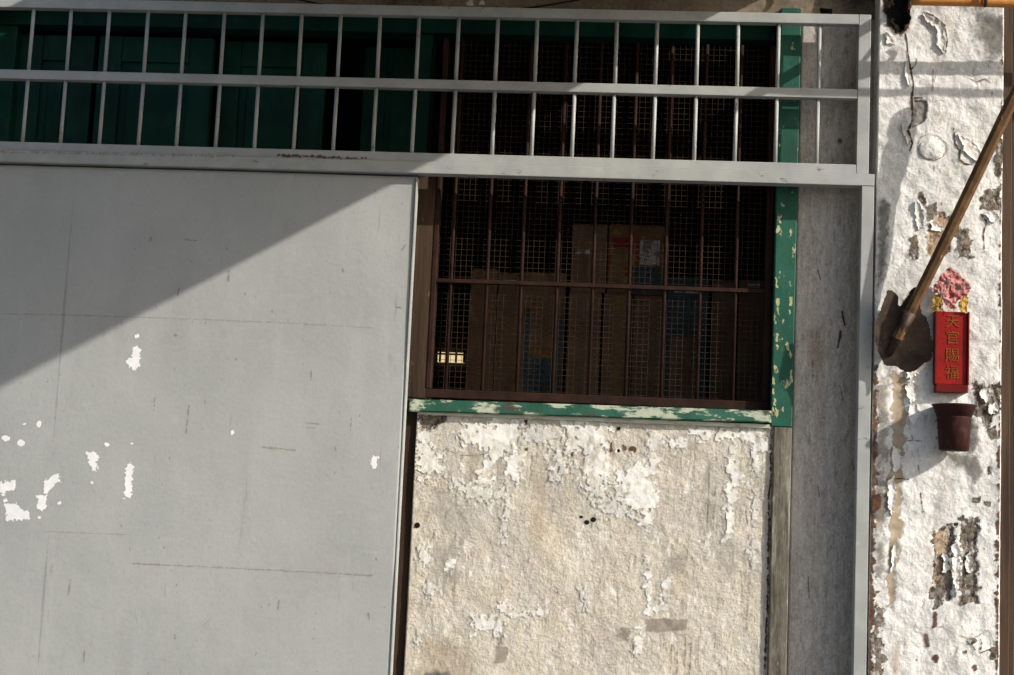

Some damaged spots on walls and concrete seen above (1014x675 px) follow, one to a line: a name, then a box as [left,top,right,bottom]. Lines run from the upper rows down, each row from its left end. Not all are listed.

spalling [885,0,911,44]
peeling [923,11,948,54]
crack [902,33,935,151]
spalling [912,99,927,128]
spalling [909,139,1003,259]
spalling [771,365,779,418]
peeling [414,415,771,575]
peeling [886,362,928,608]
spalling [928,515,982,611]